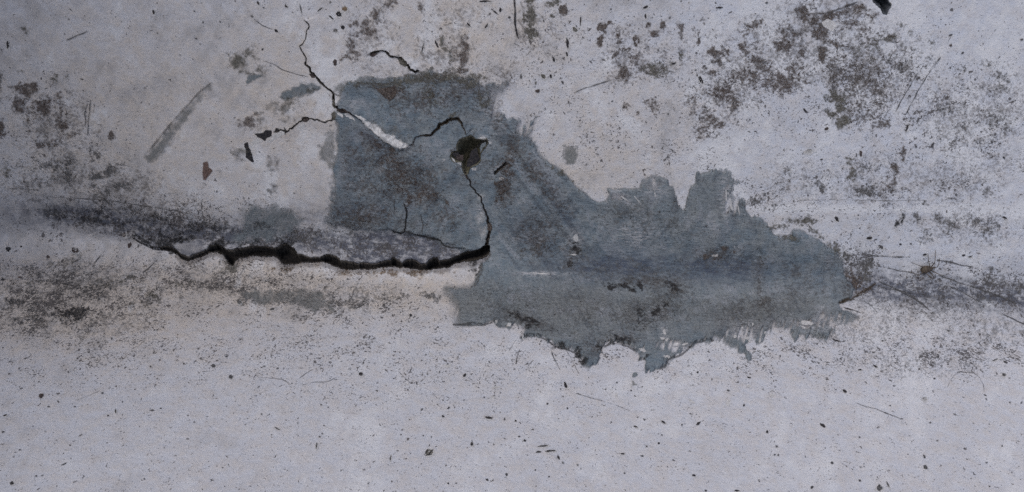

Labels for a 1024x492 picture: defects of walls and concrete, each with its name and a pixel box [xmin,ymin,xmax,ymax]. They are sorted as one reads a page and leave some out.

crack [244,6,364,164]
crack [369,50,418,73]
crack [387,112,466,149]
crack [133,170,492,286]
damp [564,243,686,329]
damp [767,214,873,300]